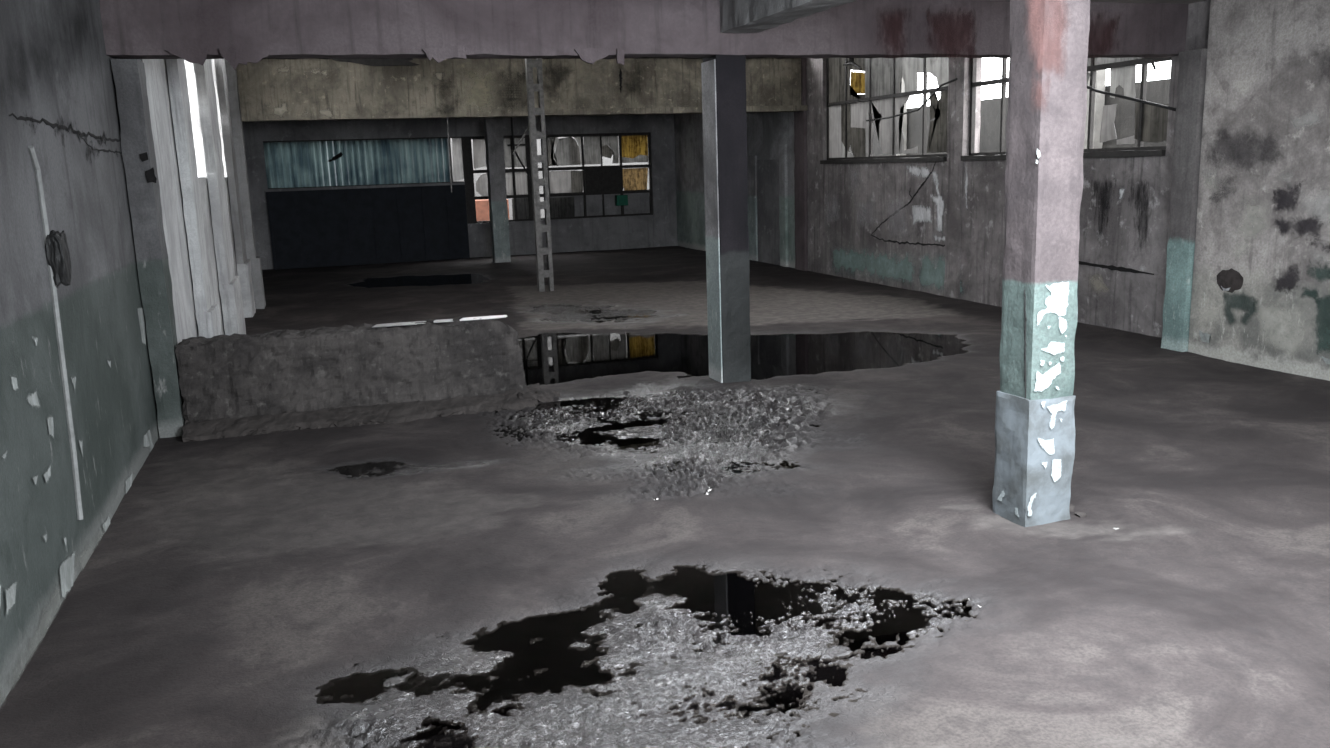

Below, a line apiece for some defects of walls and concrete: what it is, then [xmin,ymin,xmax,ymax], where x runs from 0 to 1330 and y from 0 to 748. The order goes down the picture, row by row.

water stain [1214,131,1277,163]
water stain [1091,182,1149,244]
water stain [1273,184,1330,251]
water stain [1275,266,1299,291]
peeling [137,307,146,345]
peeling [1034,282,1069,482]
peeling [11,377,54,438]
peeling [143,429,154,453]
peeling [997,491,1037,517]
peeling [0,583,16,614]
spalling [14,516,110,684]